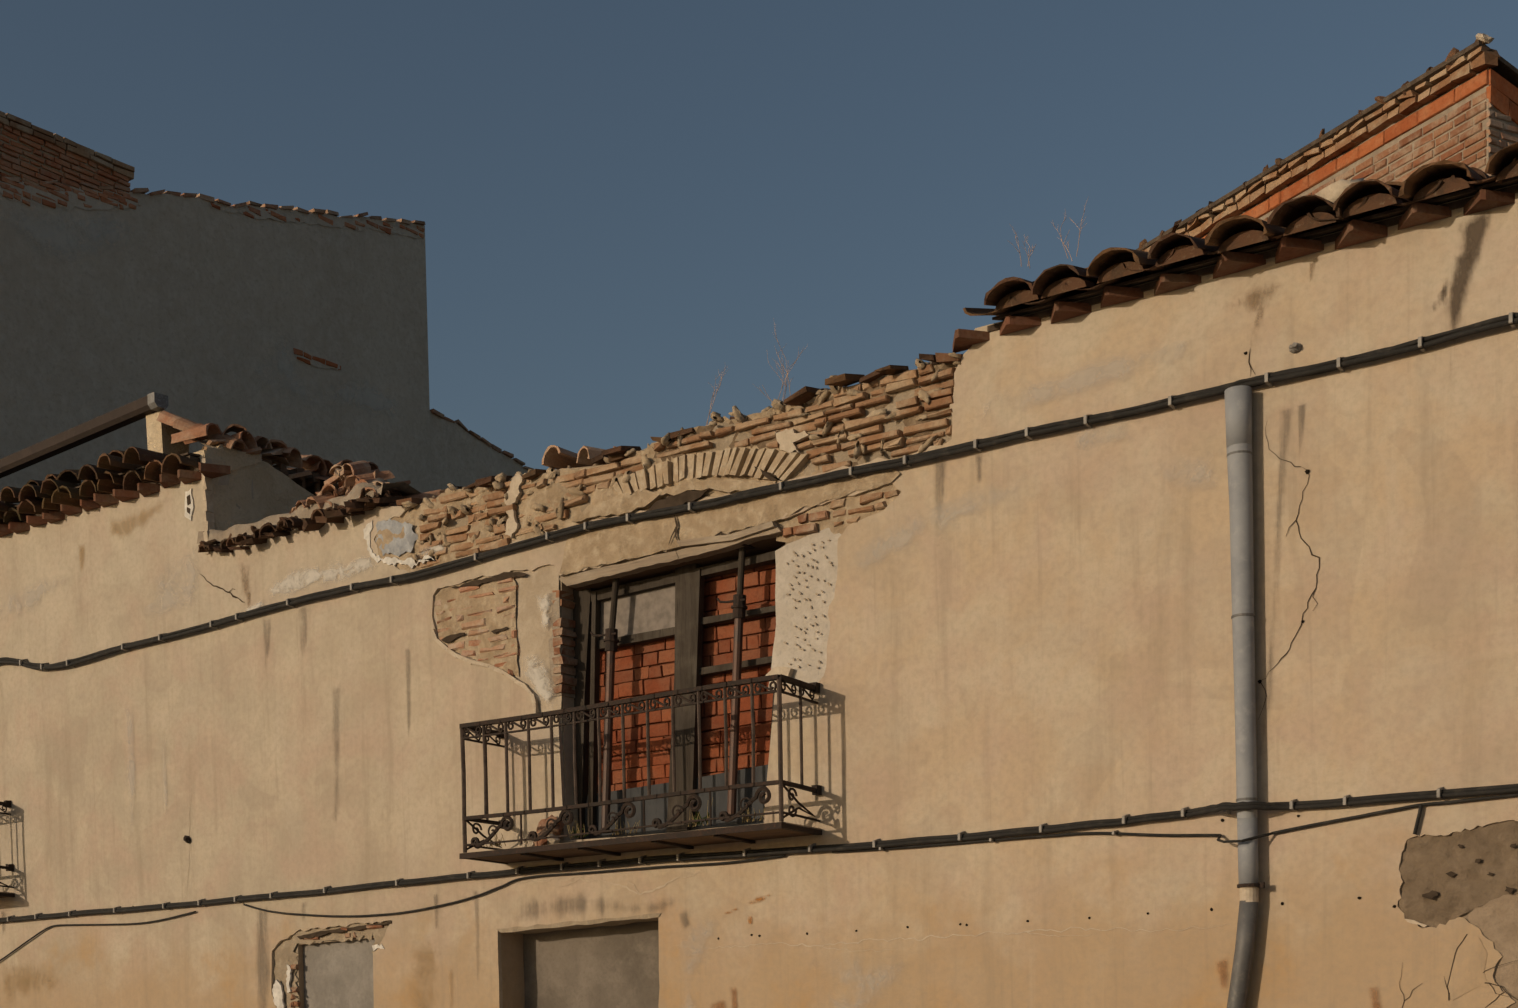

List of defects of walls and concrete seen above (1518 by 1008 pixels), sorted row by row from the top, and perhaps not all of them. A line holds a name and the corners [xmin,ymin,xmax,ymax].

spalling [0,182,143,211]
damp [1442,214,1486,327]
spalling [432,468,902,732]
crack [1258,423,1320,717]
spalling [272,920,392,1008]
spalling [1398,820,1518,1008]